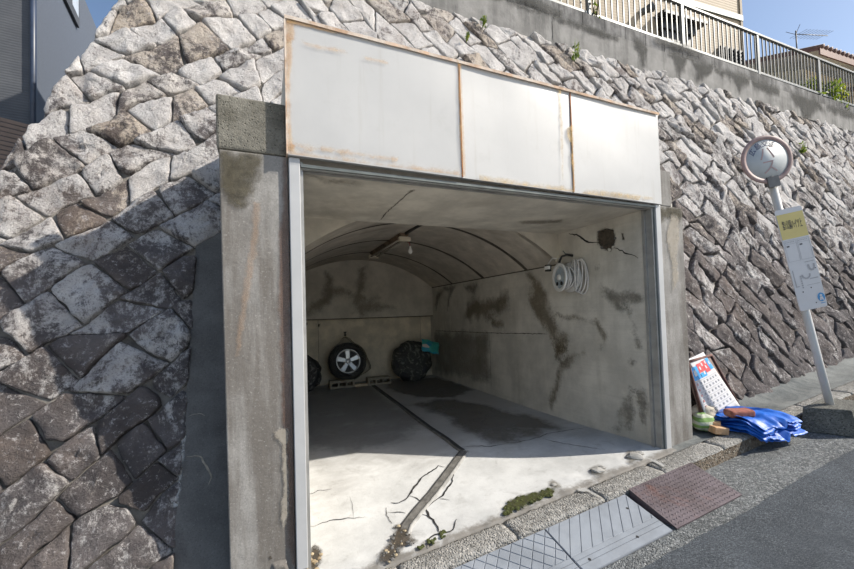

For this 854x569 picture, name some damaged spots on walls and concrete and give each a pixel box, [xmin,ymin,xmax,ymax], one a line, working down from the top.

damp [220,151,261,208]
crack [569,233,638,258]
spalling [597,228,624,251]
damp [528,274,570,401]
damp [388,378,557,441]
crack [386,465,457,547]